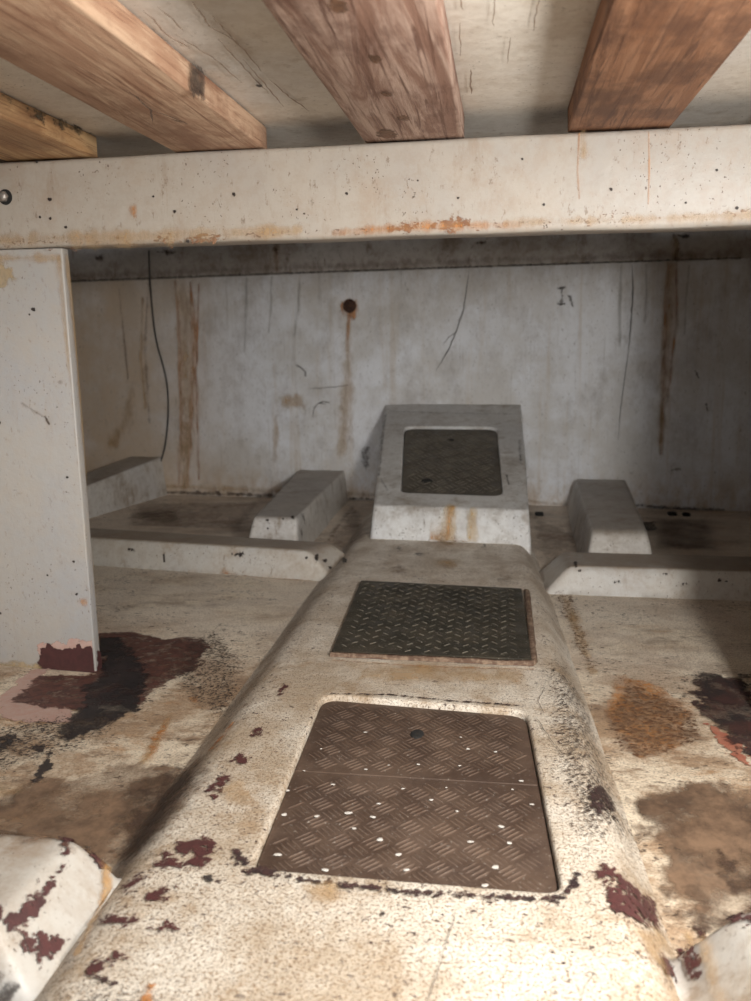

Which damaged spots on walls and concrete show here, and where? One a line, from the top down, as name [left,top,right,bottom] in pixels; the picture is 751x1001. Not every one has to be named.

crack [437,274,469,368]
peeling [0,624,248,783]
corrosion [604,680,701,760]
peeling [683,672,751,766]
peeling [0,836,112,970]
leakage [0,758,199,863]
peeling [44,950,180,1001]
peeling [99,913,184,934]
peeling [121,659,667,934]
peeling [659,925,707,986]
leakage [636,781,751,932]
peeling [723,910,751,931]